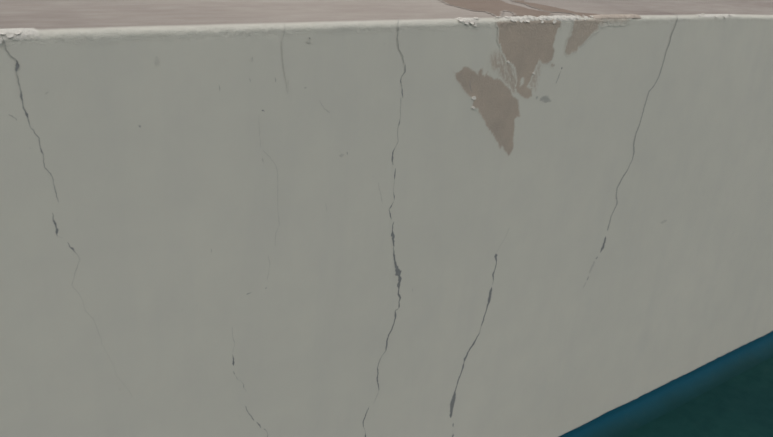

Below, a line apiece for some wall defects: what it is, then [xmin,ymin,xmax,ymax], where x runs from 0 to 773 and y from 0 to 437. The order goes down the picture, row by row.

crack [0,35,133,397]
crack [362,19,406,437]
crack [449,227,510,437]
peeling [439,0,632,157]
crack [583,12,678,288]